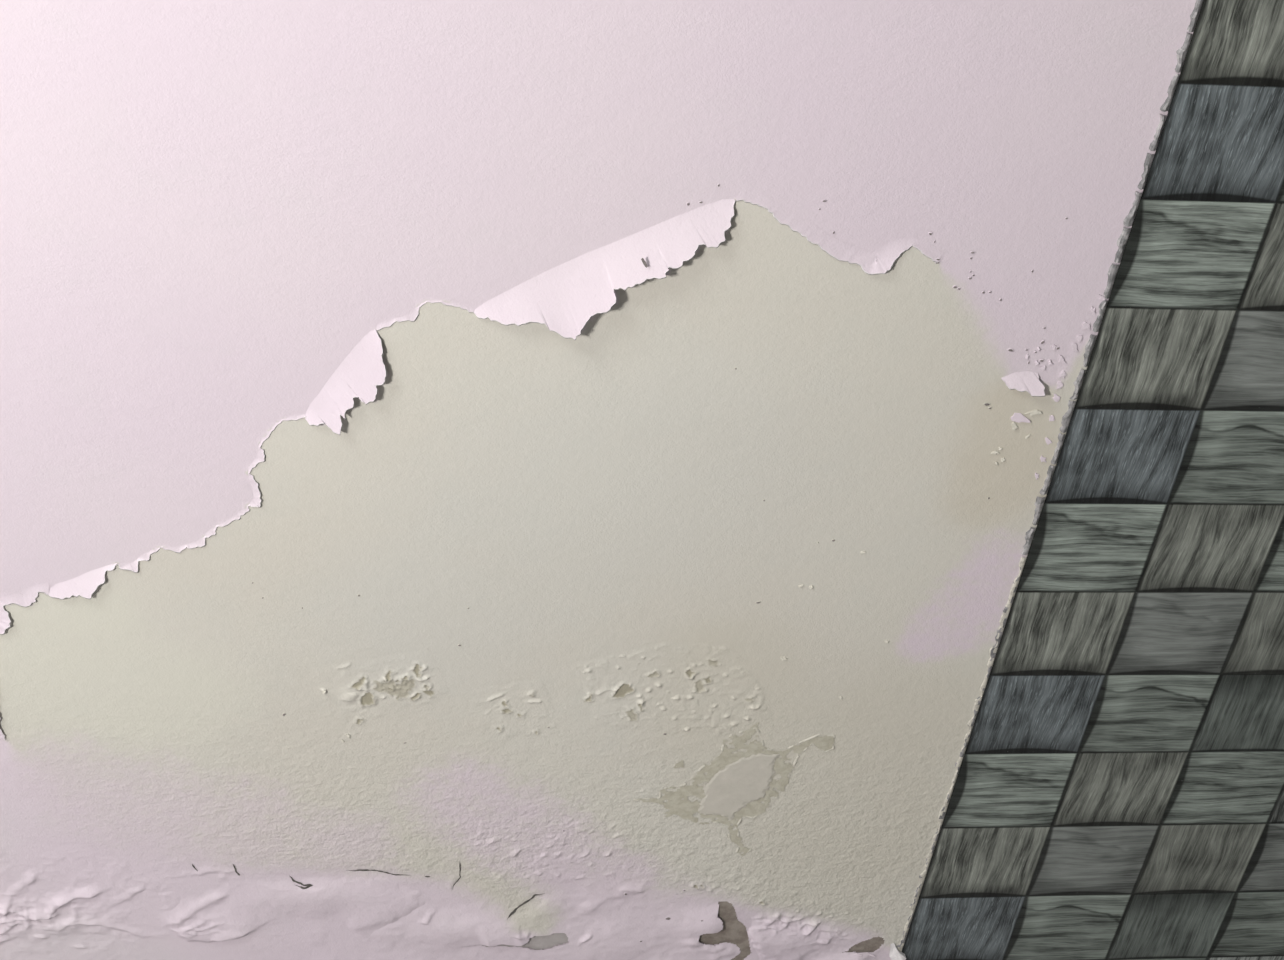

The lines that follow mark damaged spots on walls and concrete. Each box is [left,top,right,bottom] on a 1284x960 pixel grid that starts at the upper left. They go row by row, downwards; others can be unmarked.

damp [0,282,1083,960]
peeling [0,184,1106,644]
peeling [417,866,438,885]